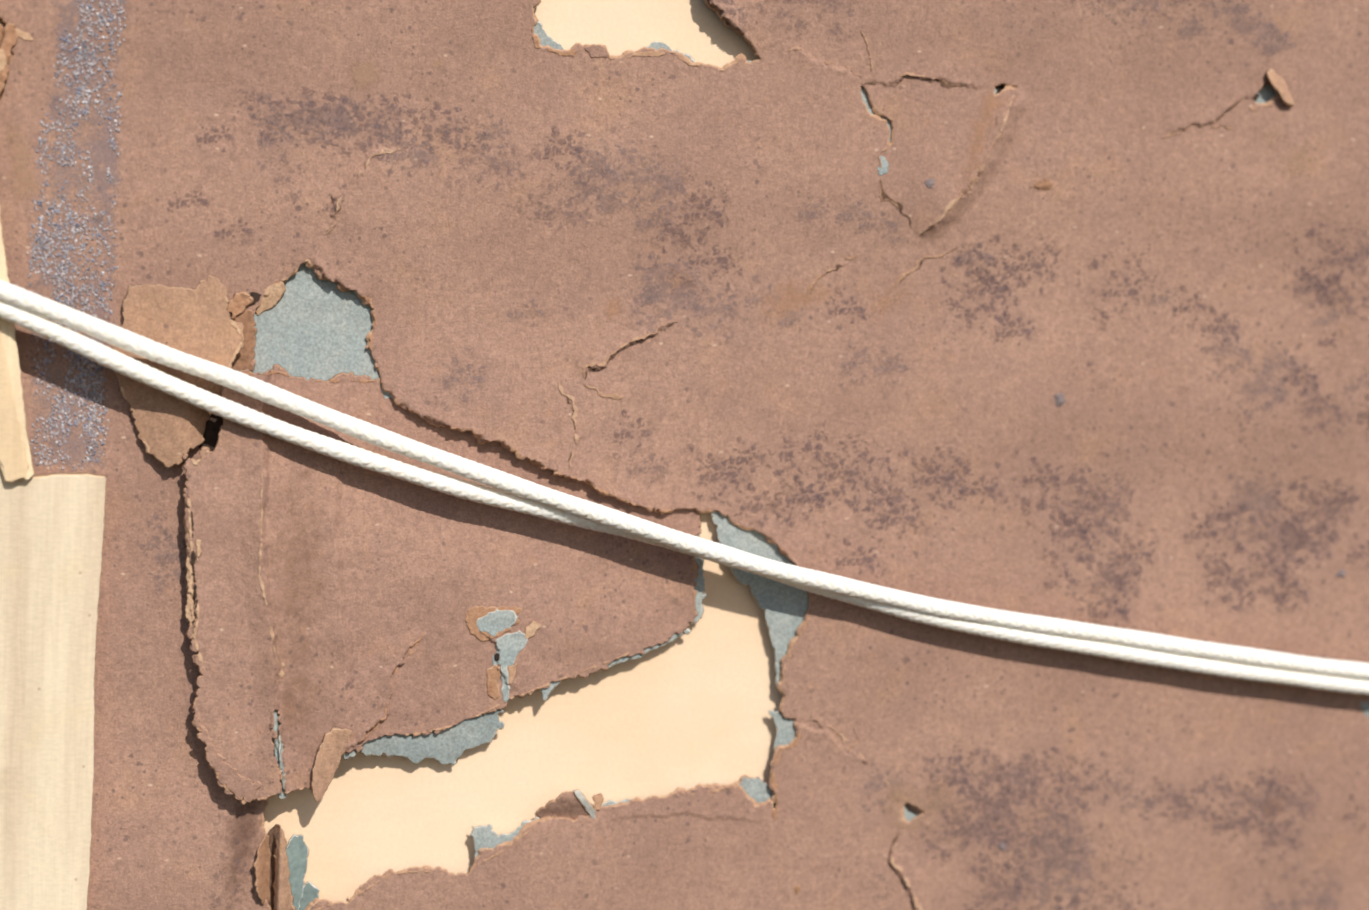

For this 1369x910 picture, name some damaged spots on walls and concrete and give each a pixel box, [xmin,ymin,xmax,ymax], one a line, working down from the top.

peeling [531,0,759,71]
crack [787,32,1016,317]
crack [1160,68,1294,138]
peeling [111,259,809,910]
crack [797,719,923,910]